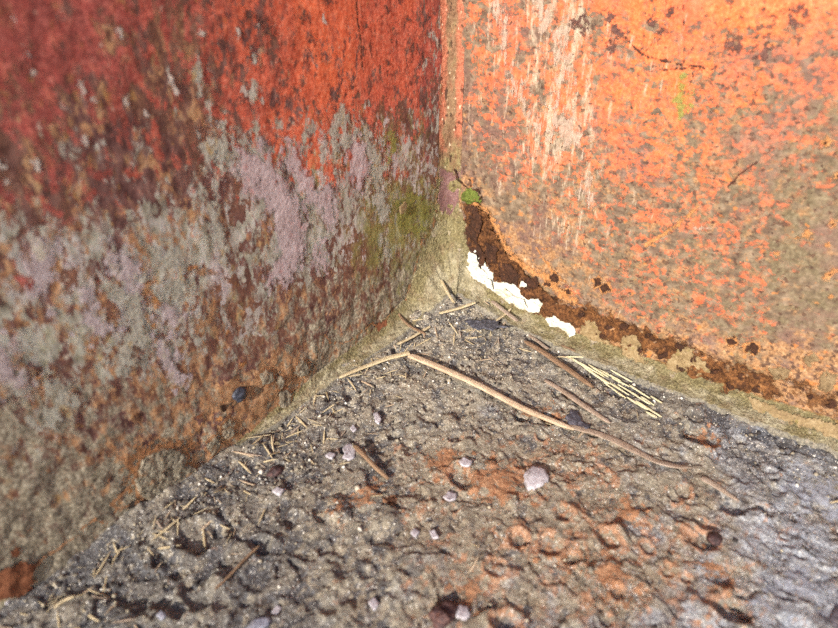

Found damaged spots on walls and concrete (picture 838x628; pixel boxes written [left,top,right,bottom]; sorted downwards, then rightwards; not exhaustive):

rust [559,300,838,416]
rust [111,353,313,500]
rust [521,400,566,441]
rust [683,422,730,460]
rust [325,476,386,523]
rust [425,439,538,513]
rust [0,547,40,602]